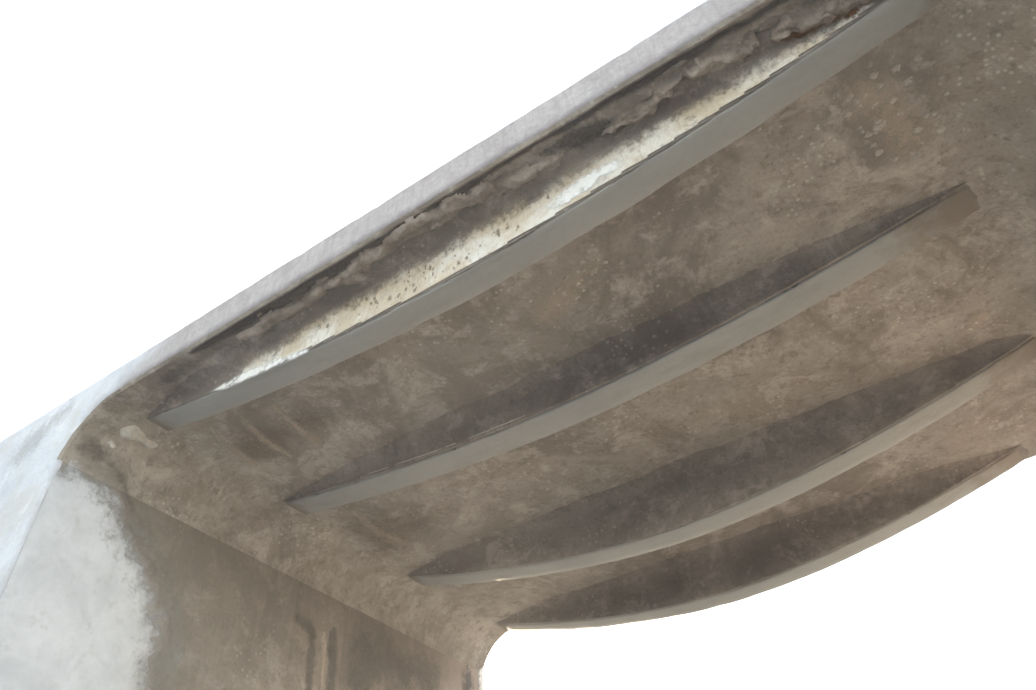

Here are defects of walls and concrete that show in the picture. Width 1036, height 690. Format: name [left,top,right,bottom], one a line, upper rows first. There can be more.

spalling [601,0,873,138]
spalling [236,152,564,341]
leakage [307,629,336,690]
leakage [463,665,485,690]